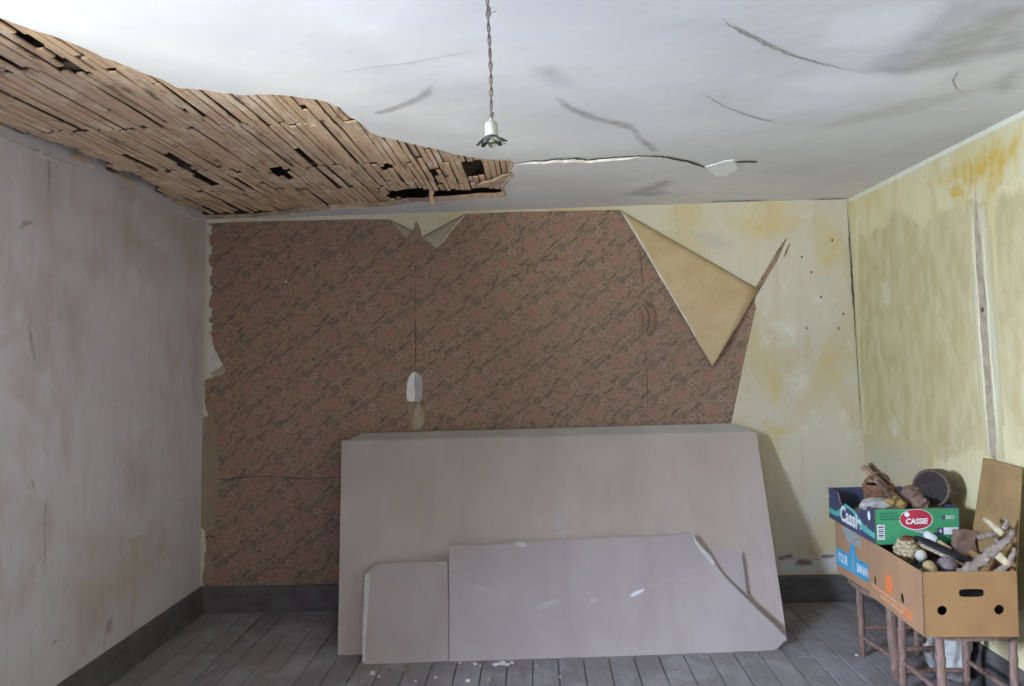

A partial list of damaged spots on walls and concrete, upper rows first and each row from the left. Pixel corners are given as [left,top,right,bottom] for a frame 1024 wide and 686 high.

crack [722,19,857,72]
flaking render [0,18,515,216]
crack [515,156,704,168]
leakage [918,119,1024,203]
peeling [390,214,465,249]
peeling [620,210,758,365]
peeling [856,195,987,469]